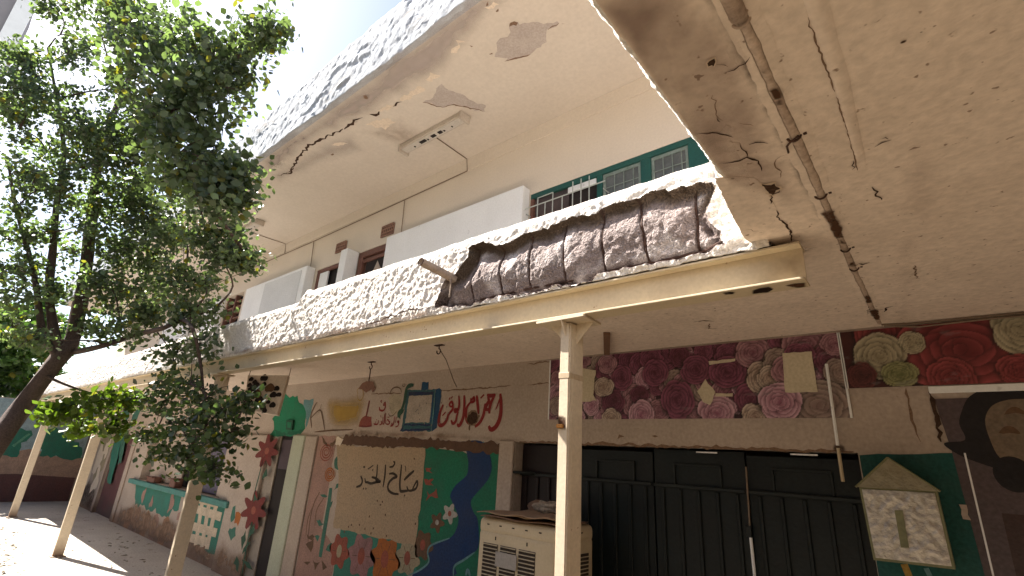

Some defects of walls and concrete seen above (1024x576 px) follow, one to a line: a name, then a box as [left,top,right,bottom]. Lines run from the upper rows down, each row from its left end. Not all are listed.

peeling [489,21,559,61]
peeling [366,73,486,130]
crack [280,102,399,176]
crack [700,95,792,257]
spalling [434,176,791,308]
corrosion [821,211,845,244]
crack [905,389,943,442]